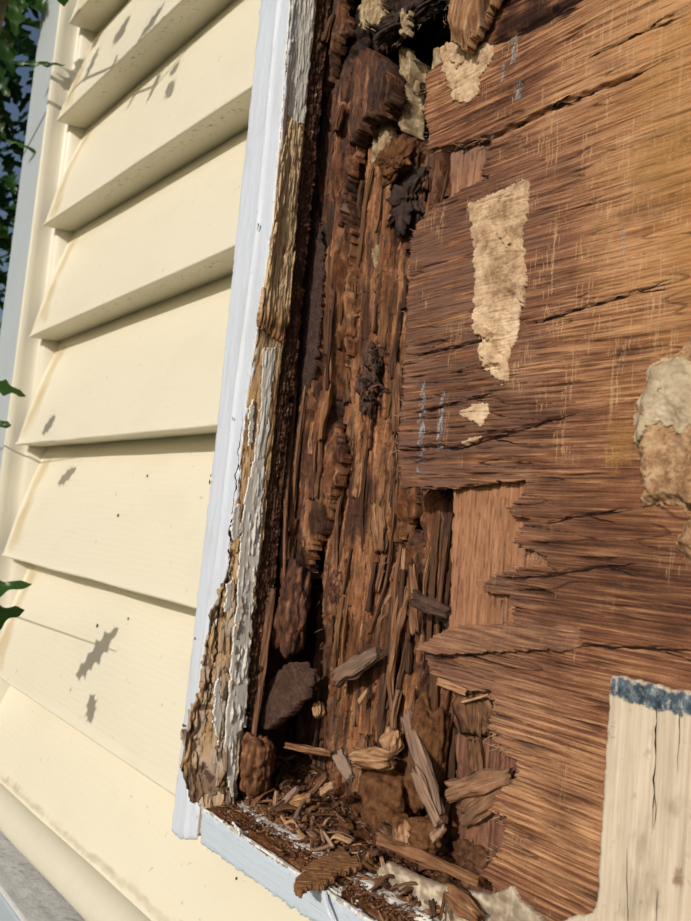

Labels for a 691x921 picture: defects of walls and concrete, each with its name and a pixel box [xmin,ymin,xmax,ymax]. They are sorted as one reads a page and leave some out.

peeling [380,6,494,103]
crack [417,277,674,356]
peeling [180,0,328,876]
peeling [633,356,691,448]
crack [547,508,633,524]
crack [512,563,657,579]
crack [652,707,681,825]
peeling [321,868,446,921]